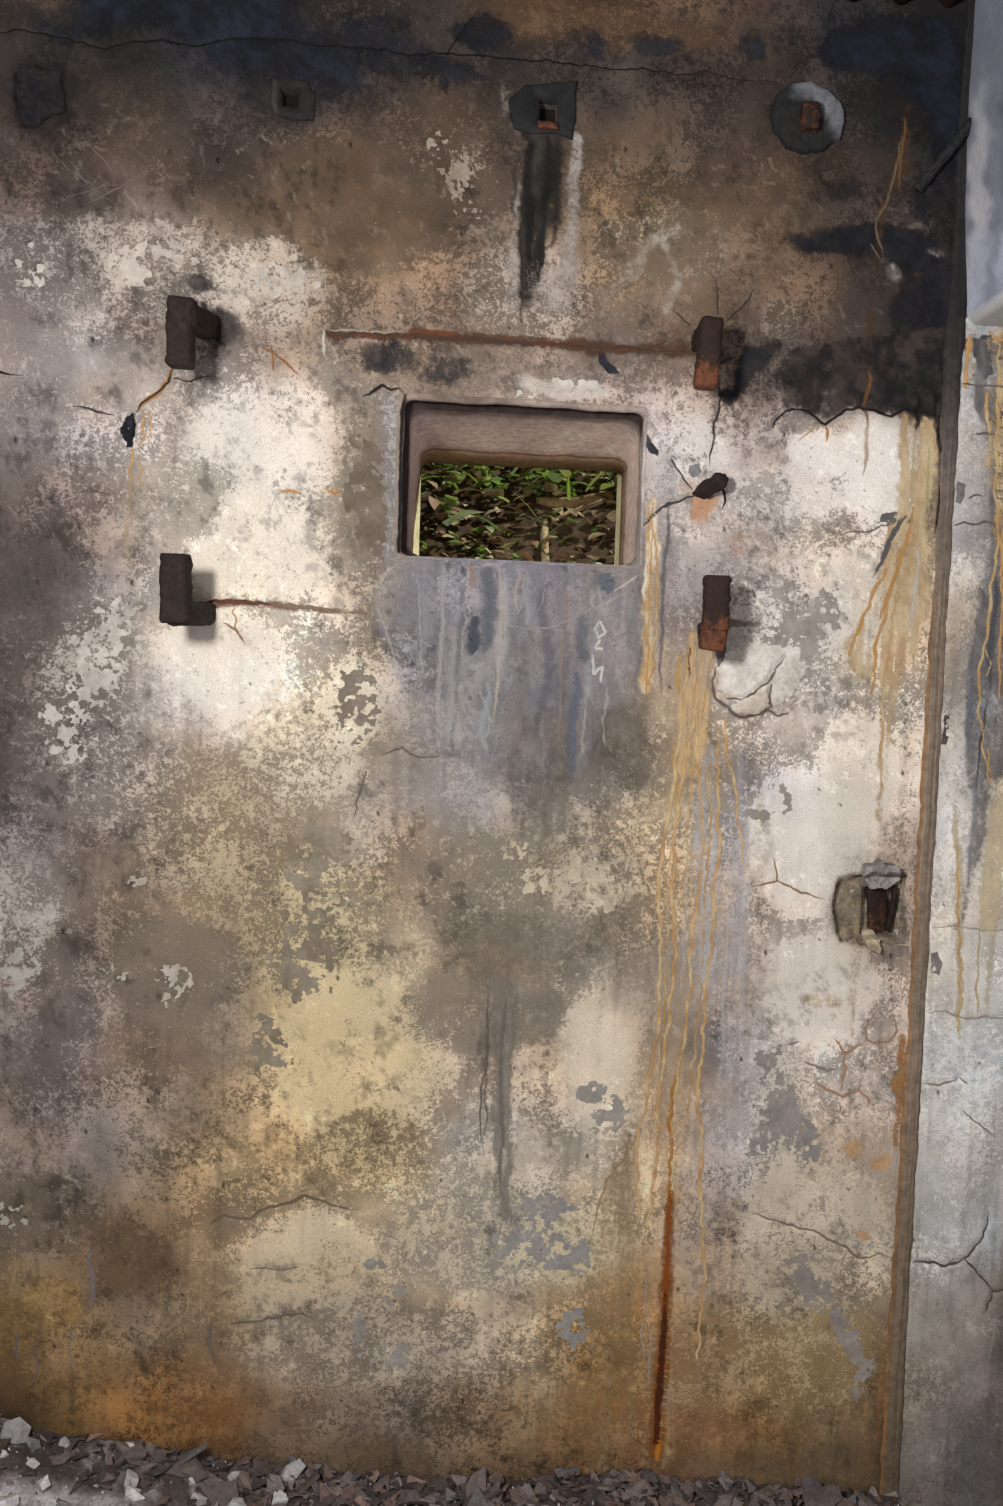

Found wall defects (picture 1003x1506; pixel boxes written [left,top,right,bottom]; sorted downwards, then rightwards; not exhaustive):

crack [0,16,754,81]
leakage [509,115,582,316]
corrosion [870,119,906,259]
crack [773,406,920,427]
crack [711,660,792,718]
corrosion [845,413,938,817]
corrosion [951,330,1003,1034]
corrosion [635,497,746,1461]
spalling [832,874,909,949]
leakage [484,975,513,1221]
crack [210,1194,354,1225]
crack [754,1213,1003,1312]